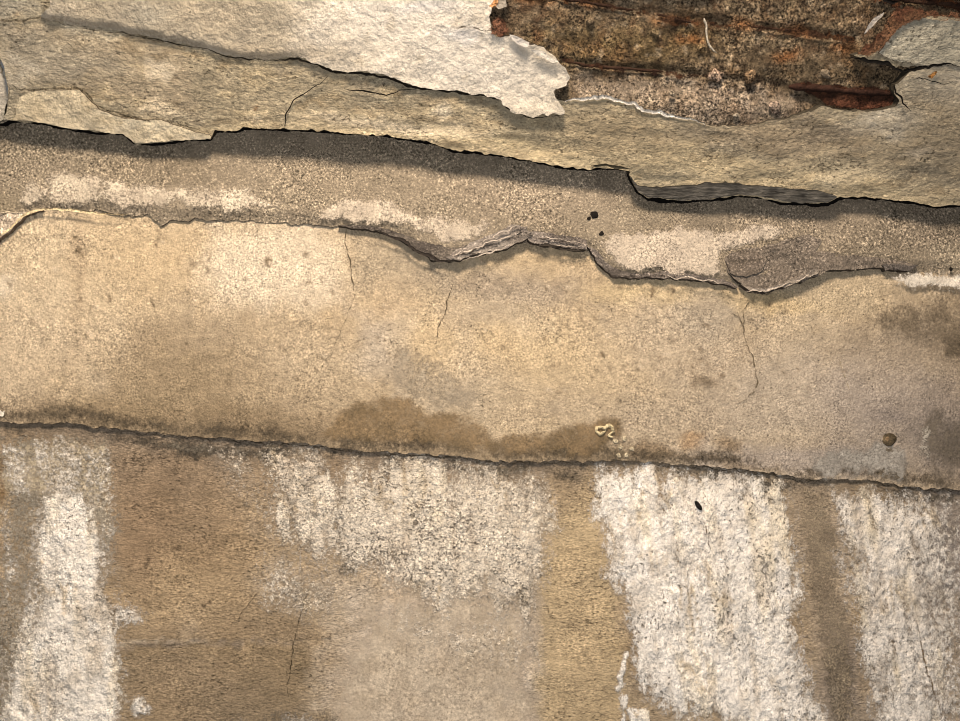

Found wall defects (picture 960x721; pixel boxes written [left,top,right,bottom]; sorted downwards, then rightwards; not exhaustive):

crack [0,17,960,209]
corrosion [489,0,508,37]
spalling [41,0,960,126]
corrosion [563,0,960,57]
corrosion [788,82,894,110]
spalling [630,176,837,204]
crack [326,233,355,359]
spalling [339,224,918,295]
crack [109,428,627,465]
damp [0,432,151,721]
damp [208,397,621,721]
damp [590,462,960,721]